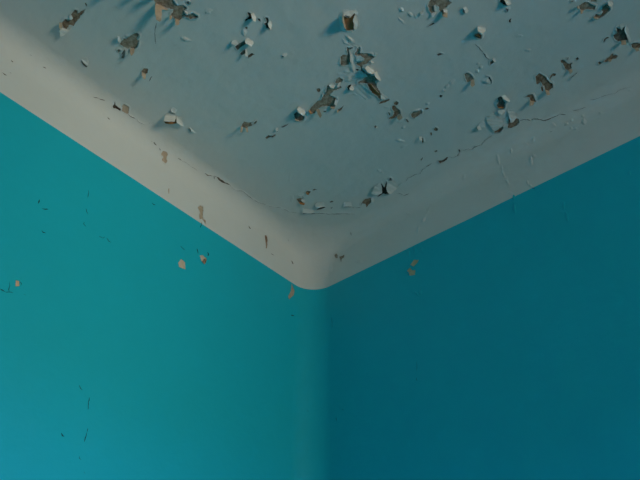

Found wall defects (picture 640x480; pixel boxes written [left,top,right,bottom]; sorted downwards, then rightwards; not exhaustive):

peeling [59,2,88,37]
peeling [153,0,200,26]
peeling [243,11,272,31]
peeling [338,8,360,33]
peeling [420,0,453,28]
peeling [568,0,613,20]
peeling [115,31,142,59]
peeling [231,38,256,59]
peeling [601,23,640,52]
peeling [264,45,430,139]
peeling [523,55,580,106]
peeling [475,95,521,134]